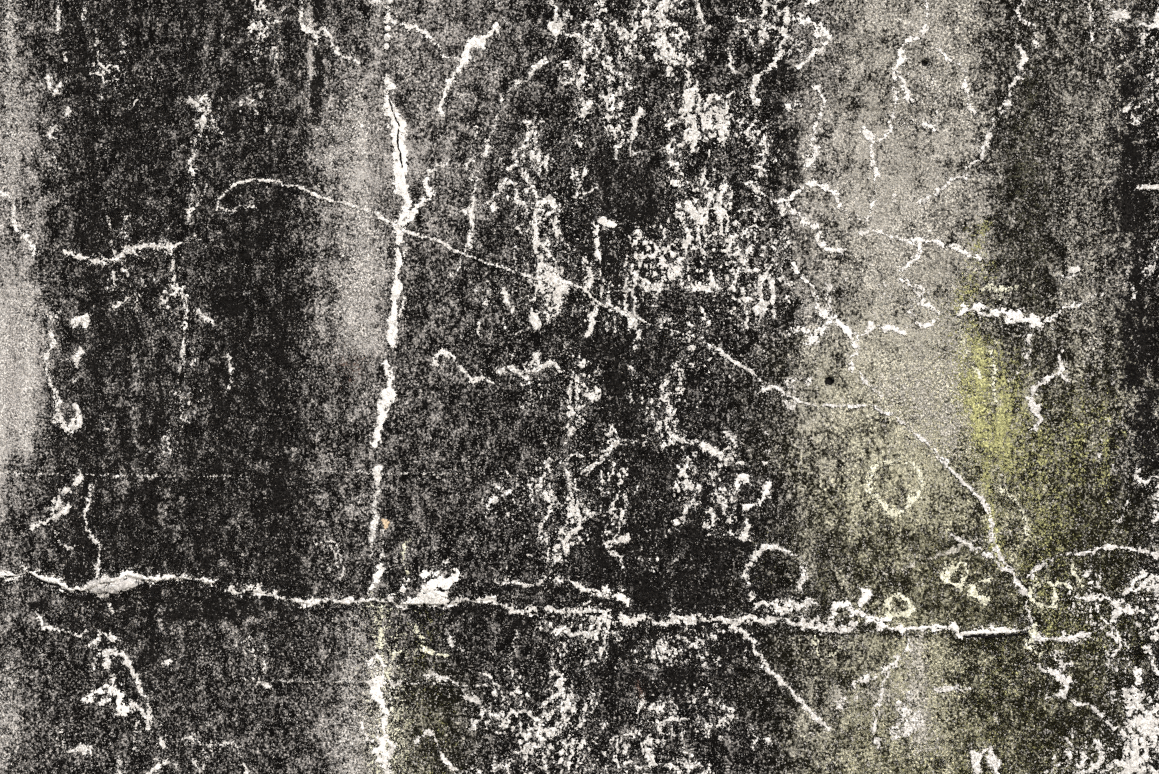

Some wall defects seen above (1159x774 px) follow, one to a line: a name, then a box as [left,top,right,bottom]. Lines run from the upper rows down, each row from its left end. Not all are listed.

crack [0,189,201,265]
crack [771,0,1041,408]
damp [0,0,412,774]
crack [216,74,1159,754]
damp [432,0,1159,731]
crack [0,468,219,598]
crack [35,609,88,639]
crack [128,660,201,773]
crack [414,729,481,774]
crack [1070,699,1145,774]